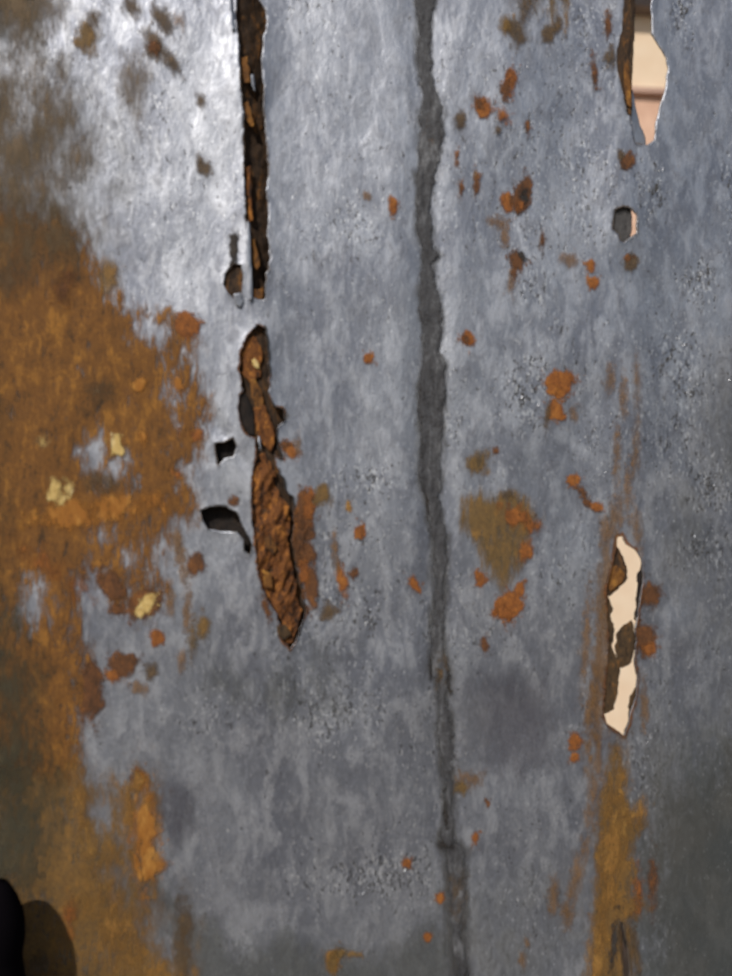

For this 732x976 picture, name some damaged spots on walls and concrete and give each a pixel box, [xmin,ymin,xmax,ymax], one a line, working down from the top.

peeling [624,64,632,108]
corrosion [223,56,270,300]
corrosion [457,165,483,198]
corrosion [489,167,533,290]
corrosion [562,254,599,291]
corrosion [624,251,639,271]
corrosion [535,368,581,428]
corrosion [0,208,300,976]
corrosion [292,483,359,621]
corrosion [346,500,366,540]
corrosion [460,491,541,627]
corrosion [548,448,663,976]